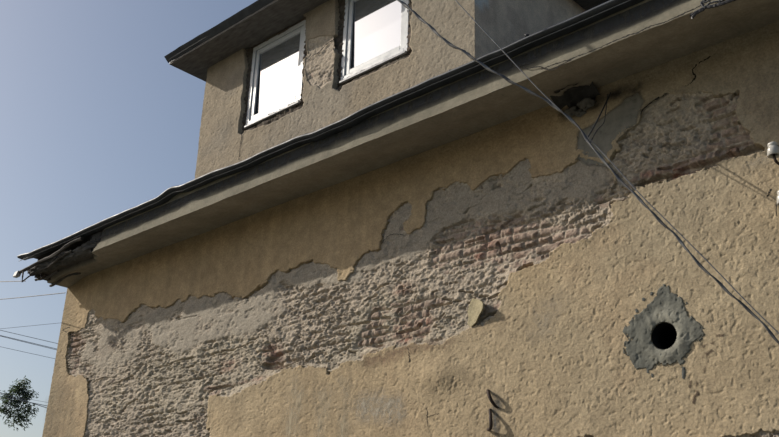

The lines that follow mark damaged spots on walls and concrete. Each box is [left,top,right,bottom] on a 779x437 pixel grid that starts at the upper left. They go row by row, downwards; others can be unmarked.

spalling [241,0,412,134]
spalling [550,82,600,118]
spalling [13,237,99,287]
spalling [66,91,763,437]
spalling [725,429,779,437]